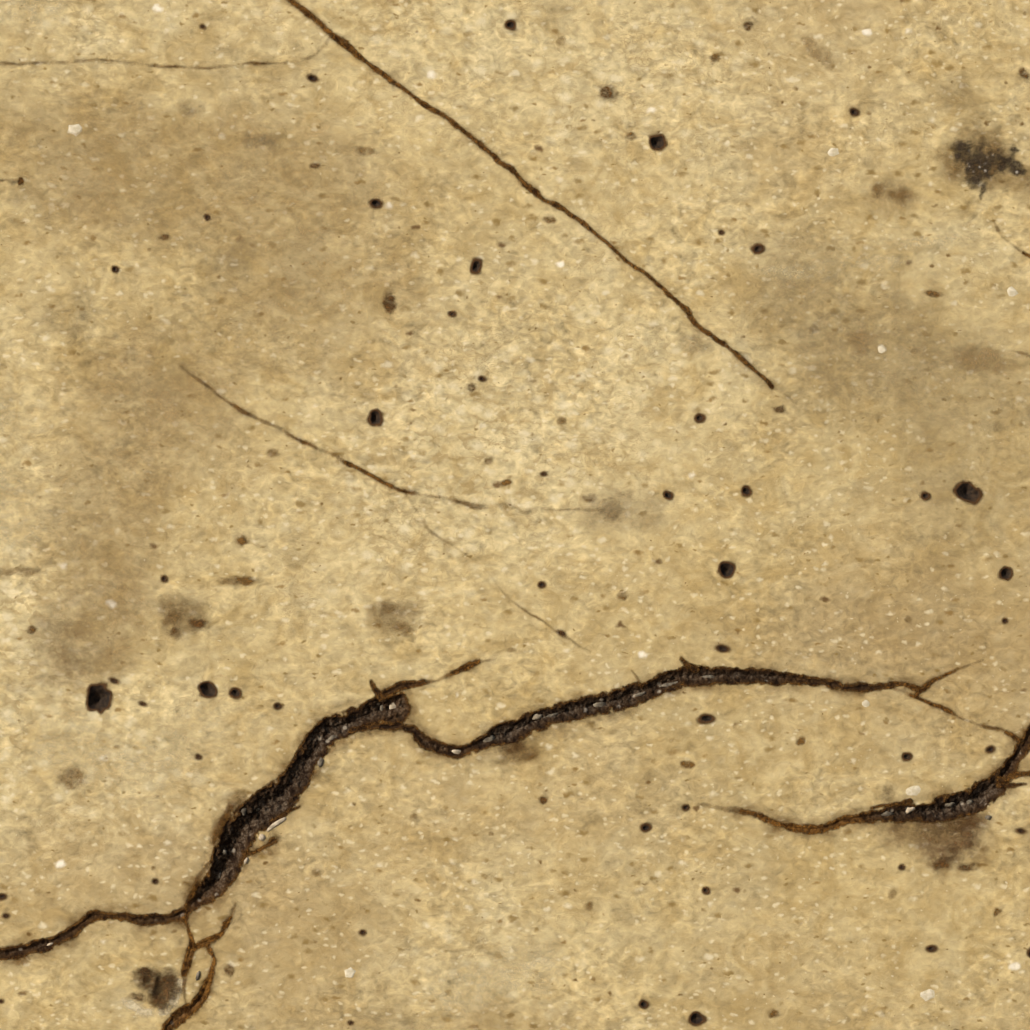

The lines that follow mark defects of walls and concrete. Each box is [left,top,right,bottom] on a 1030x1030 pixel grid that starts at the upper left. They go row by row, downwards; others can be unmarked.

crack [288,0,774,389]
crack [228,402,268,423]
crack [338,457,414,494]
crack [730,725,1030,835]
crack [0,657,956,1030]